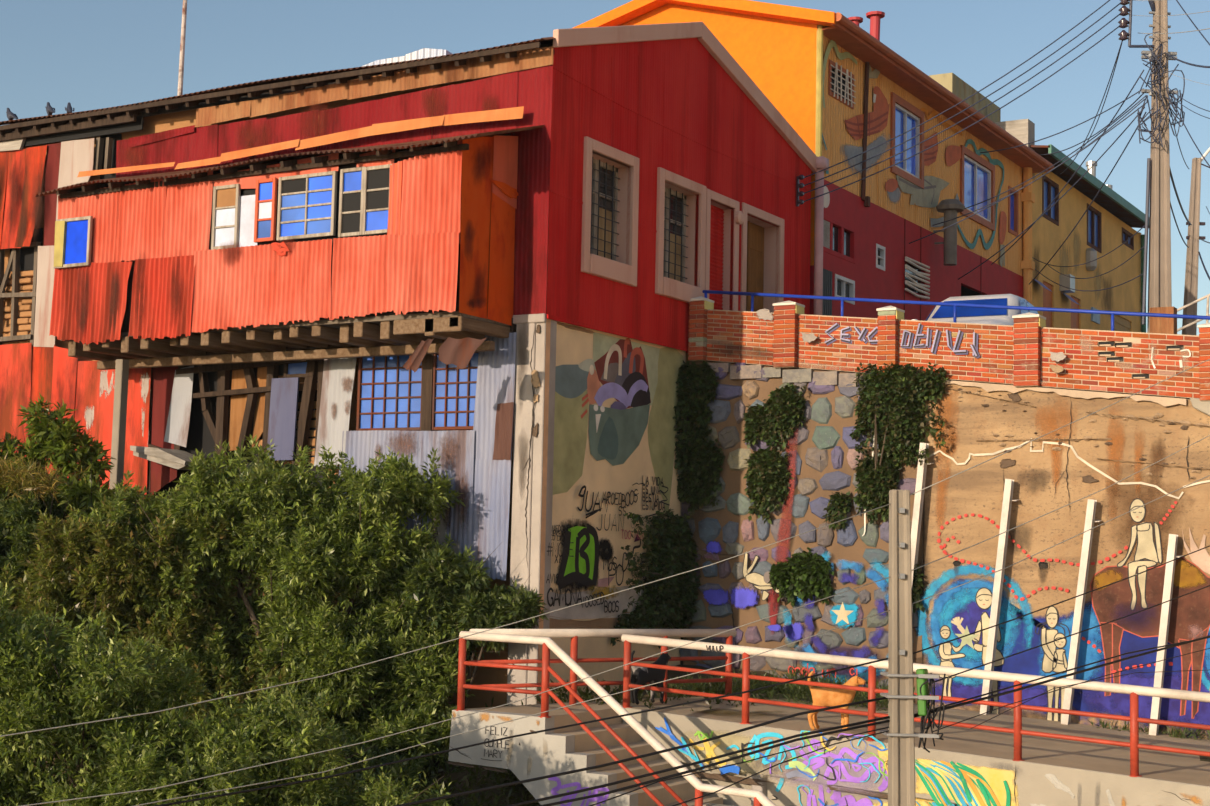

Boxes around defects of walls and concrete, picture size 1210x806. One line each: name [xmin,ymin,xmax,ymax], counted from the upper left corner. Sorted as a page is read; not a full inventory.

damp [1115,486,1177,551]